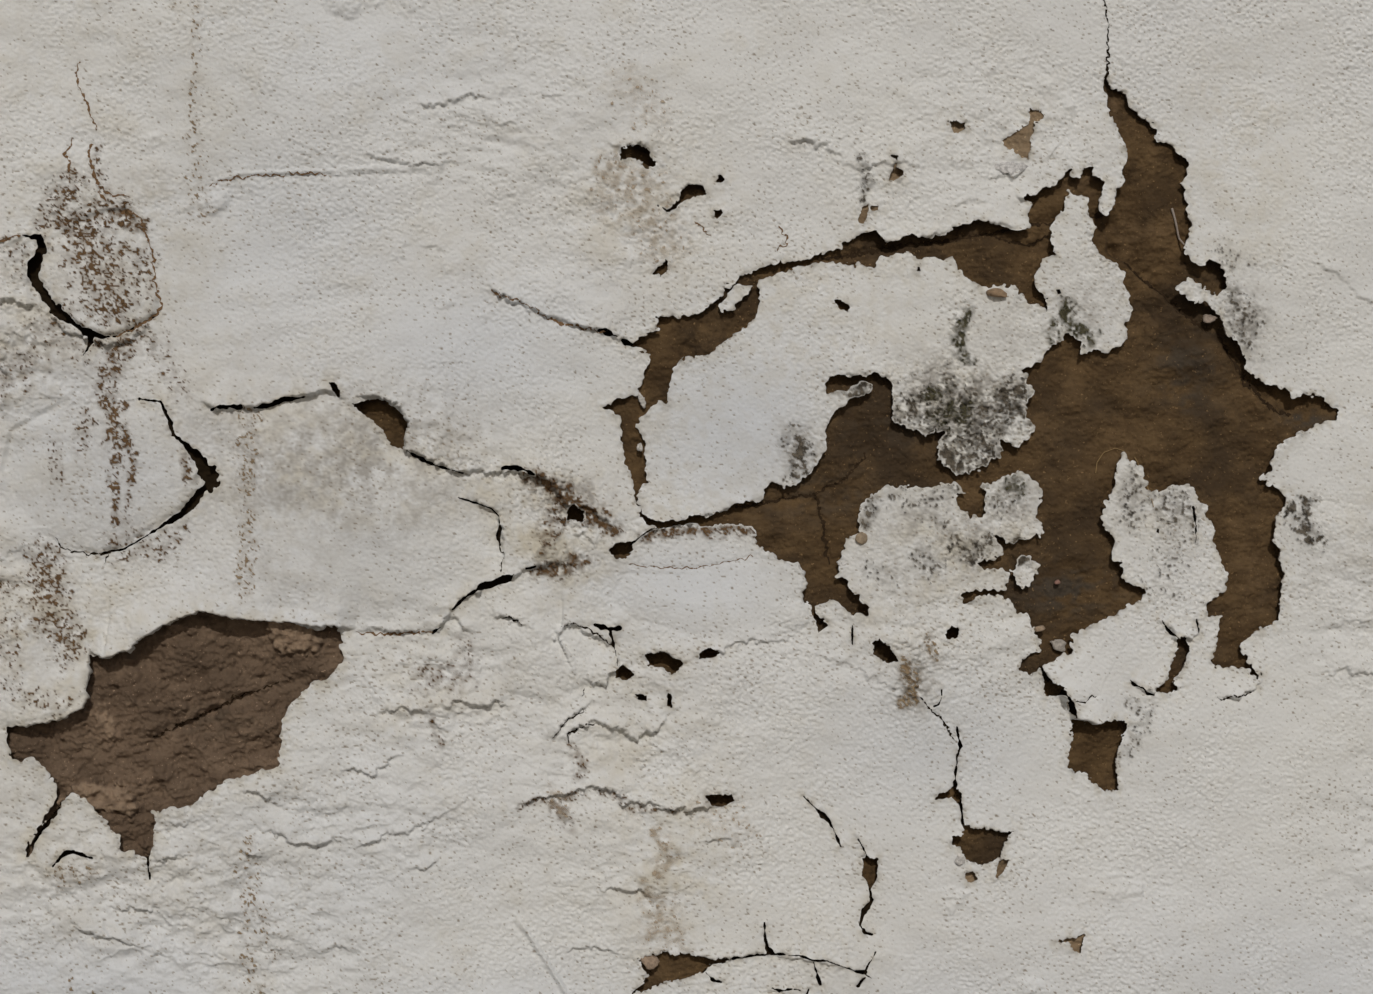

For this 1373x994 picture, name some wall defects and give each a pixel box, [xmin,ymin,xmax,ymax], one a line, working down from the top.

crack [0,62,163,355]
crack [55,397,221,564]
peeling [329,382,408,449]
peeling [602,75,1338,791]
peeling [0,611,344,883]
peeling [632,951,729,994]
peeling [705,794,734,807]
crack [702,796,876,994]
peeling [862,857,878,888]
crack [920,689,964,826]